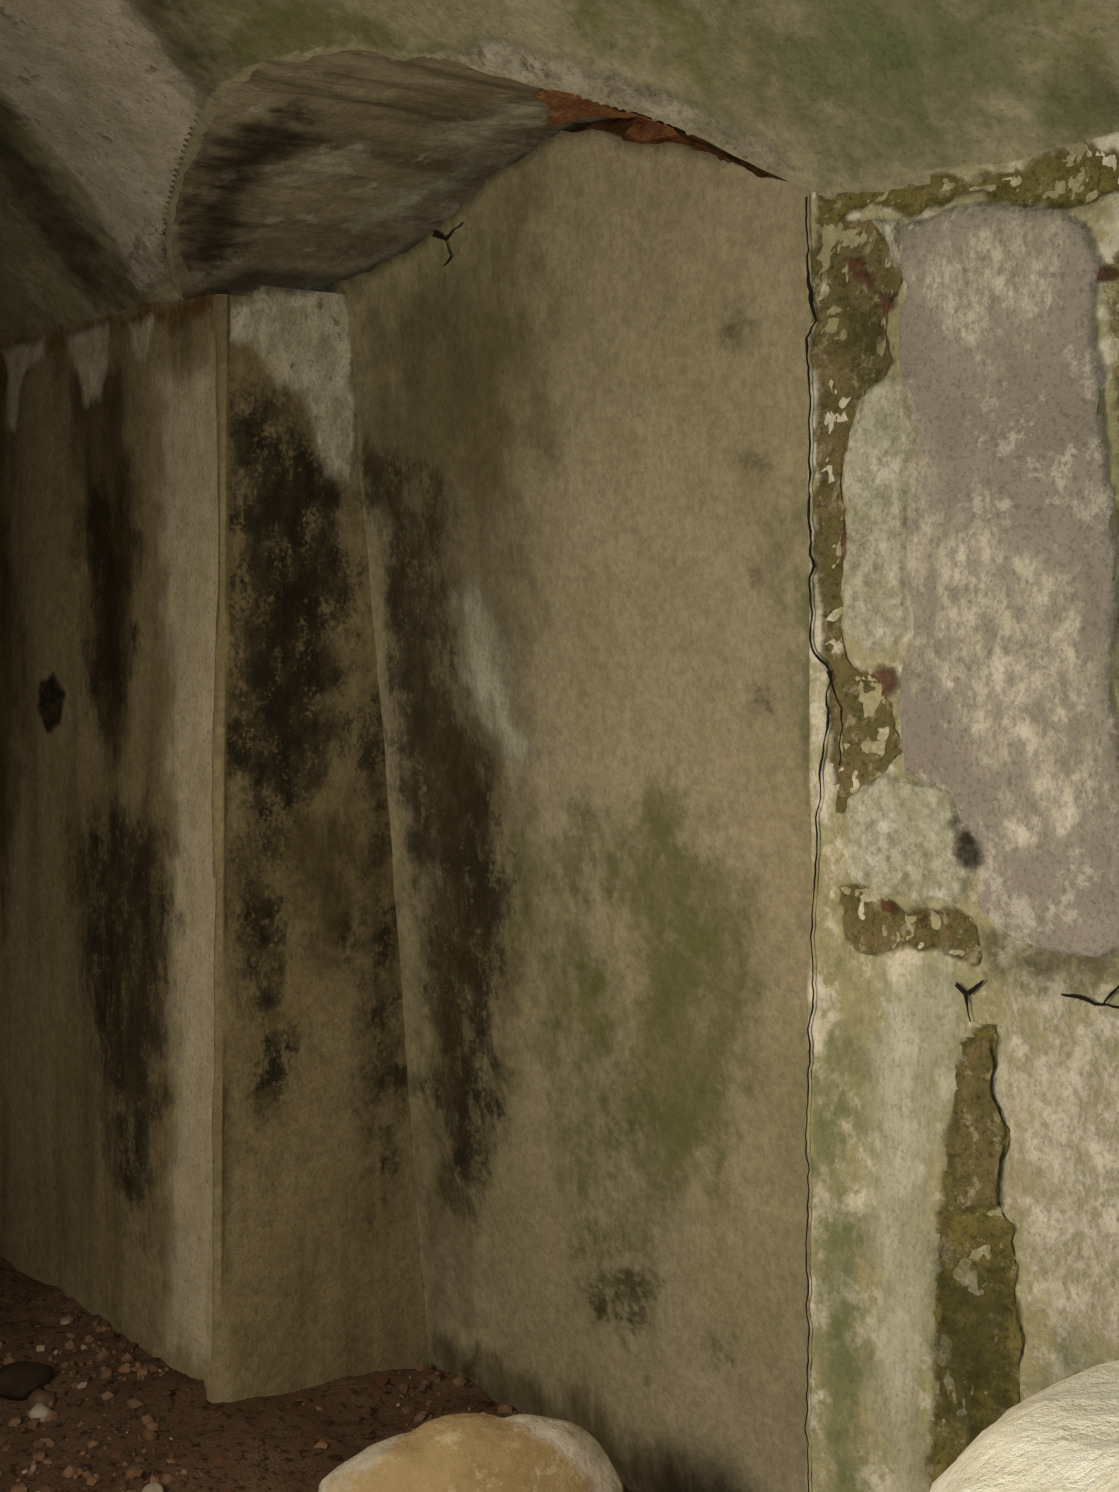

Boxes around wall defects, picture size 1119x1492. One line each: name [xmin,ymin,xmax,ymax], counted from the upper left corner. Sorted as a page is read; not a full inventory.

water stain [4,338,45,431]
water stain [68,323,135,746]
water stain [81,289,527,1370]
crack [804,197,843,1492]
crack [954,980,983,1022]
crack [1061,985,1119,1009]
spalling [925,1024,1023,1489]